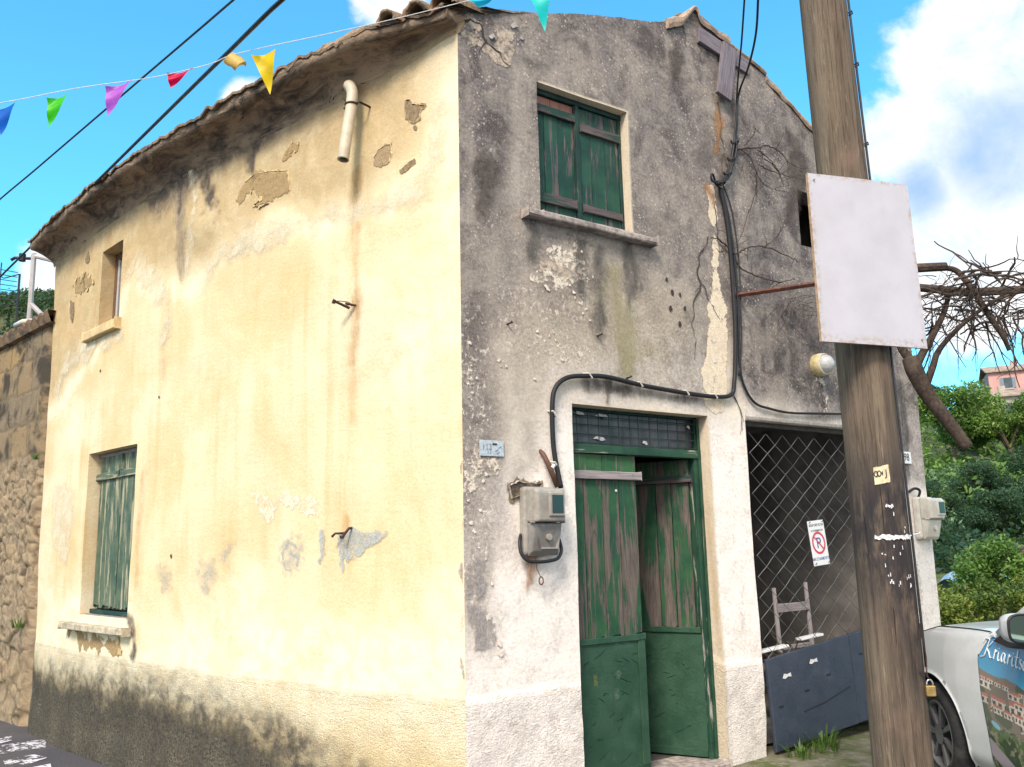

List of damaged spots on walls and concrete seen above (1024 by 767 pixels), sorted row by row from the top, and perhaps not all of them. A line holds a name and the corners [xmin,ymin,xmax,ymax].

crack [464,18,510,66]
spalling [404,99,426,130]
damp [247,139,258,172]
peeling [235,140,299,209]
spalling [373,143,416,174]
damp [475,157,500,213]
damp [177,170,214,274]
peeling [530,242,594,321]
crack [691,237,720,357]
peeling [67,629,122,657]